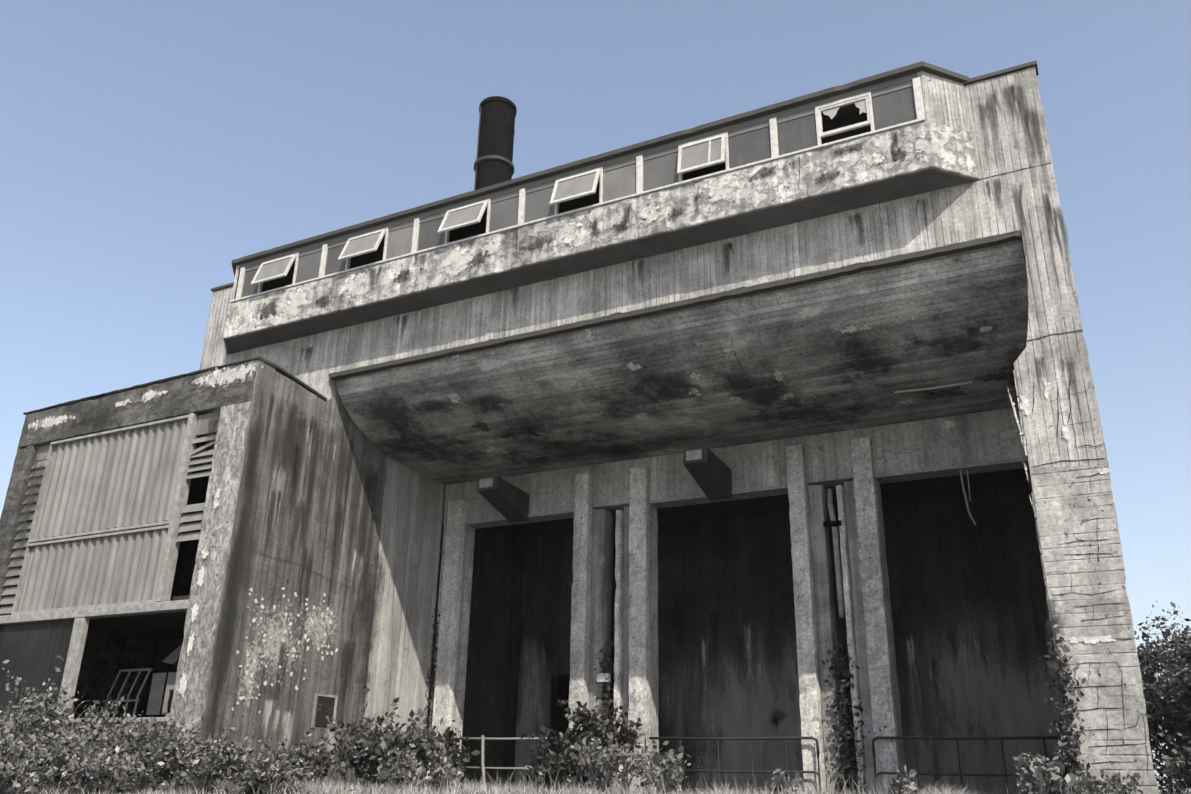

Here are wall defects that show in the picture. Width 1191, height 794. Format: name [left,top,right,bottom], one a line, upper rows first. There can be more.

water stain [980,86,1041,154]
water stain [986,180,1001,204]
water stain [1015,185,1025,220]
water stain [1045,197,1066,241]
peeling [193,363,263,387]
peeling [116,390,168,407]
peeling [28,415,75,431]
spalling [197,545,209,587]
water stain [206,397,382,744]
crack [1032,378,1148,776]
spalling [187,602,199,656]
spalling [177,671,187,699]